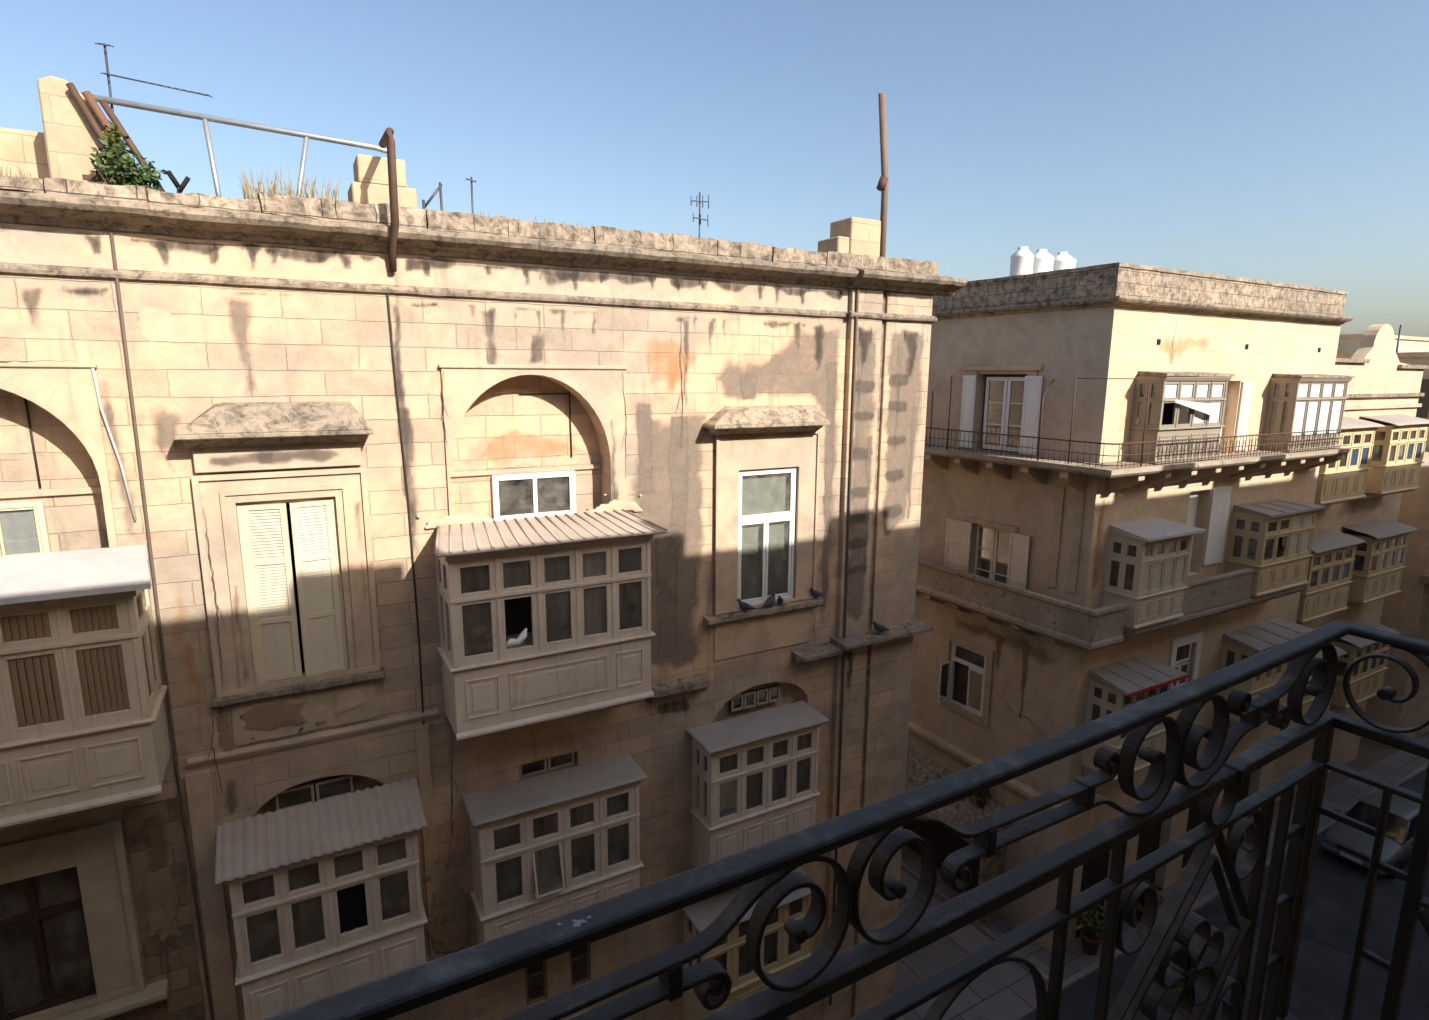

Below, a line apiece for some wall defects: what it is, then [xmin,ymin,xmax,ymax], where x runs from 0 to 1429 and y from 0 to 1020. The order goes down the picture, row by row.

leakage [136,240,218,262]
leakage [247,244,371,266]
leakage [230,300,248,350]
crack [0,357,68,365]
leakage [720,322,838,609]
leakage [847,330,922,619]
leakage [635,404,704,666]